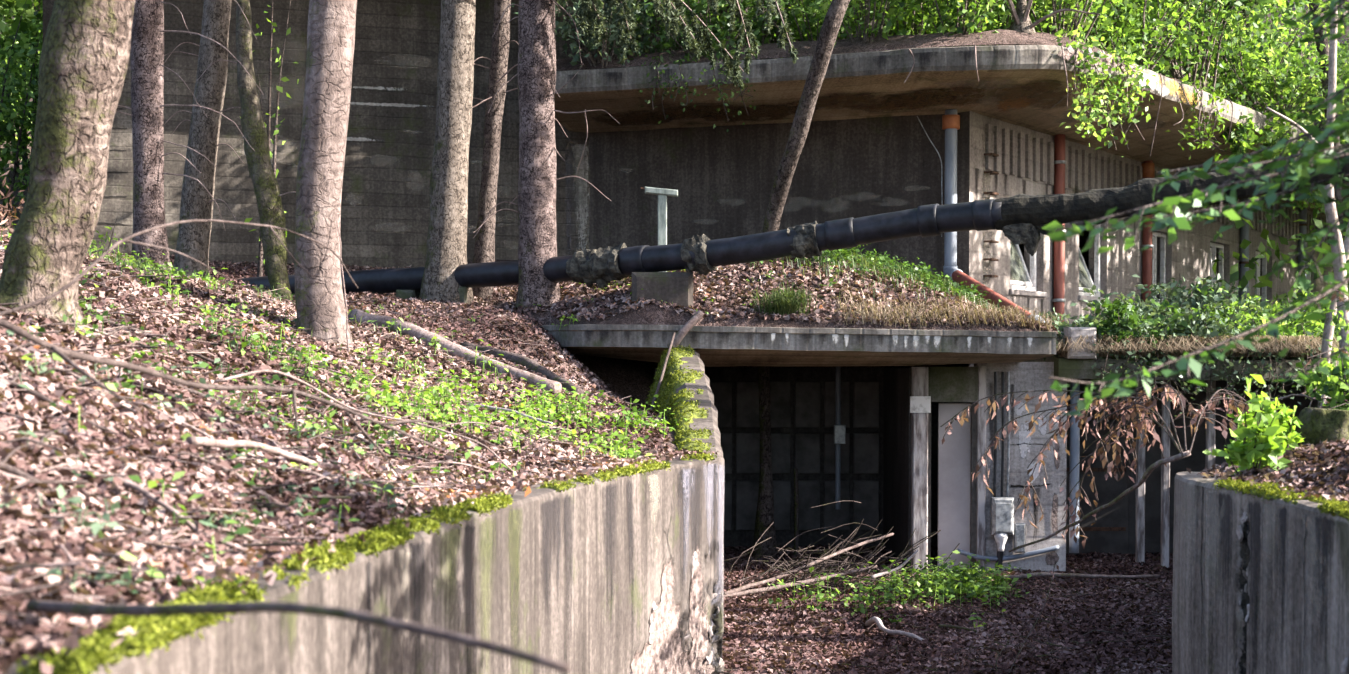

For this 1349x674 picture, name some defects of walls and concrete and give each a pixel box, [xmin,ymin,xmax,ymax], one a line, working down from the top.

spalling [630,545,724,674]